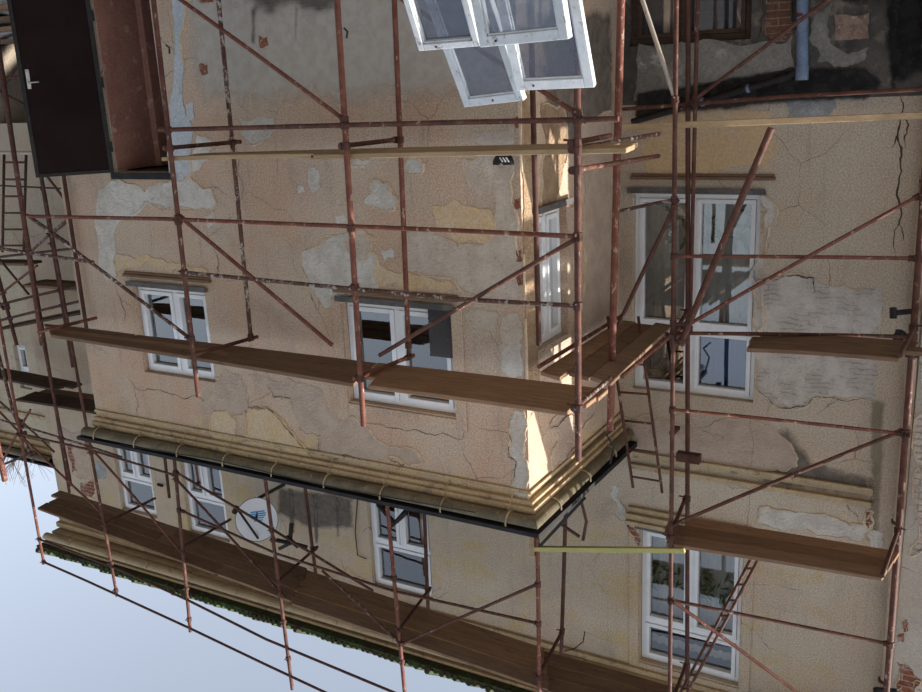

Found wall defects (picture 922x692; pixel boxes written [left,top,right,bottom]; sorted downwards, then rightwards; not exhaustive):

peeling [168,135,218,230]
crack [891,96,909,256]
crack [235,394,355,460]
peeling [756,505,885,548]
flaking render [897,620,908,642]
flaking render [895,662,922,692]